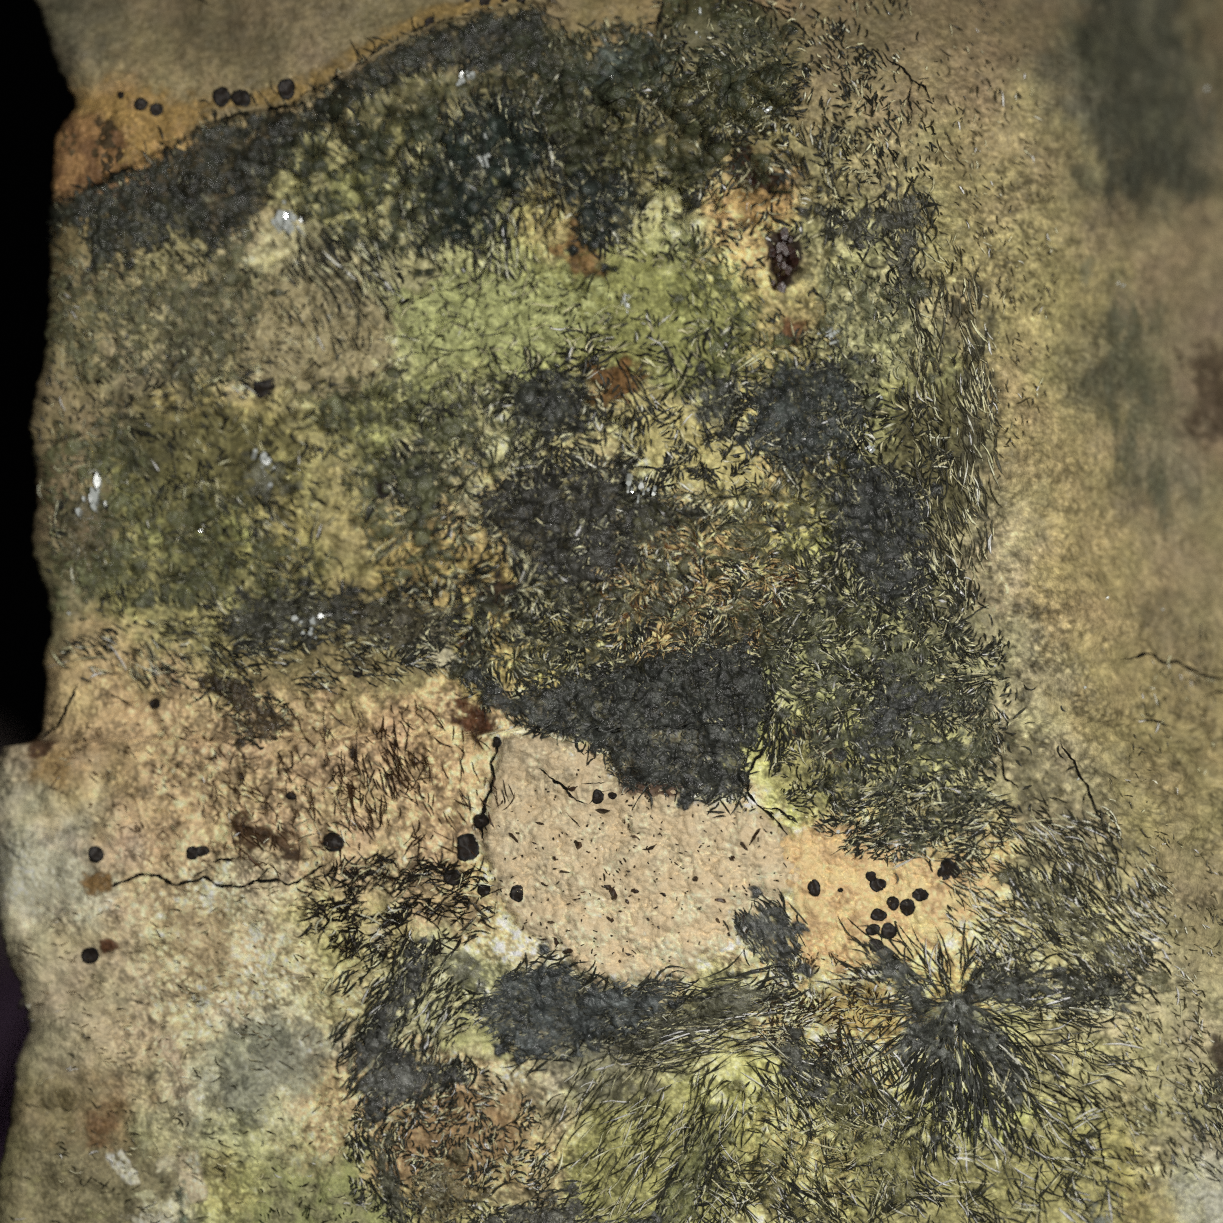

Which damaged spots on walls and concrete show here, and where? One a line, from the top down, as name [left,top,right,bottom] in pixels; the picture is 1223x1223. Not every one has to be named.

crack [199,51,380,123]
crack [96,167,136,186]
crack [1120,652,1223,697]
crack [106,856,328,890]